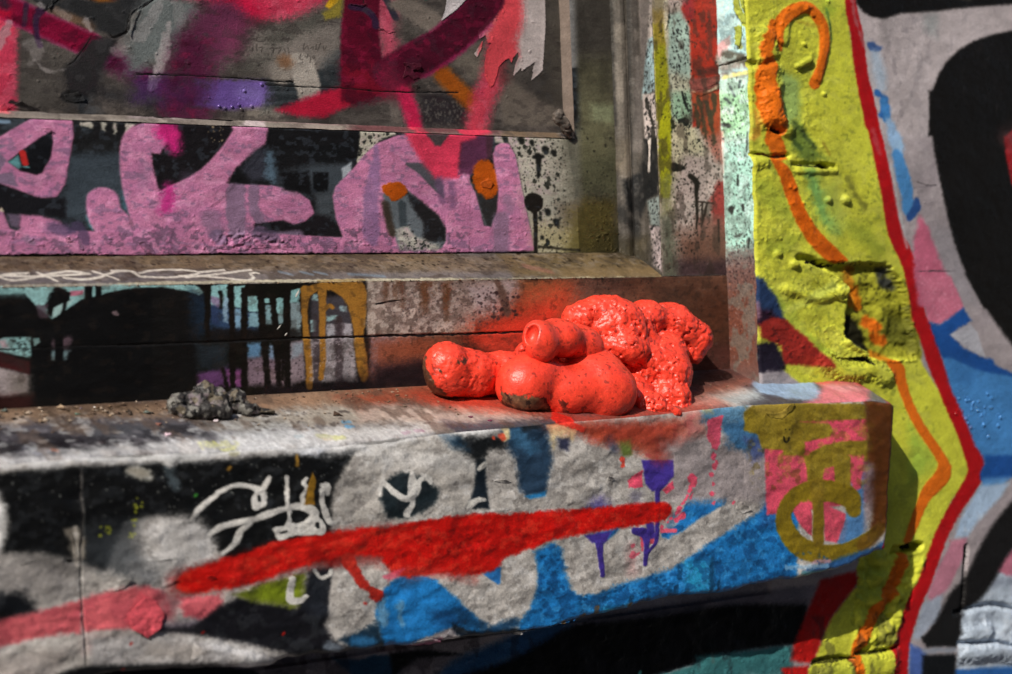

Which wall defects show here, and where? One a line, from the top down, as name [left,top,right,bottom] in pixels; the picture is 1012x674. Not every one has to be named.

crack [68,0,154,65]